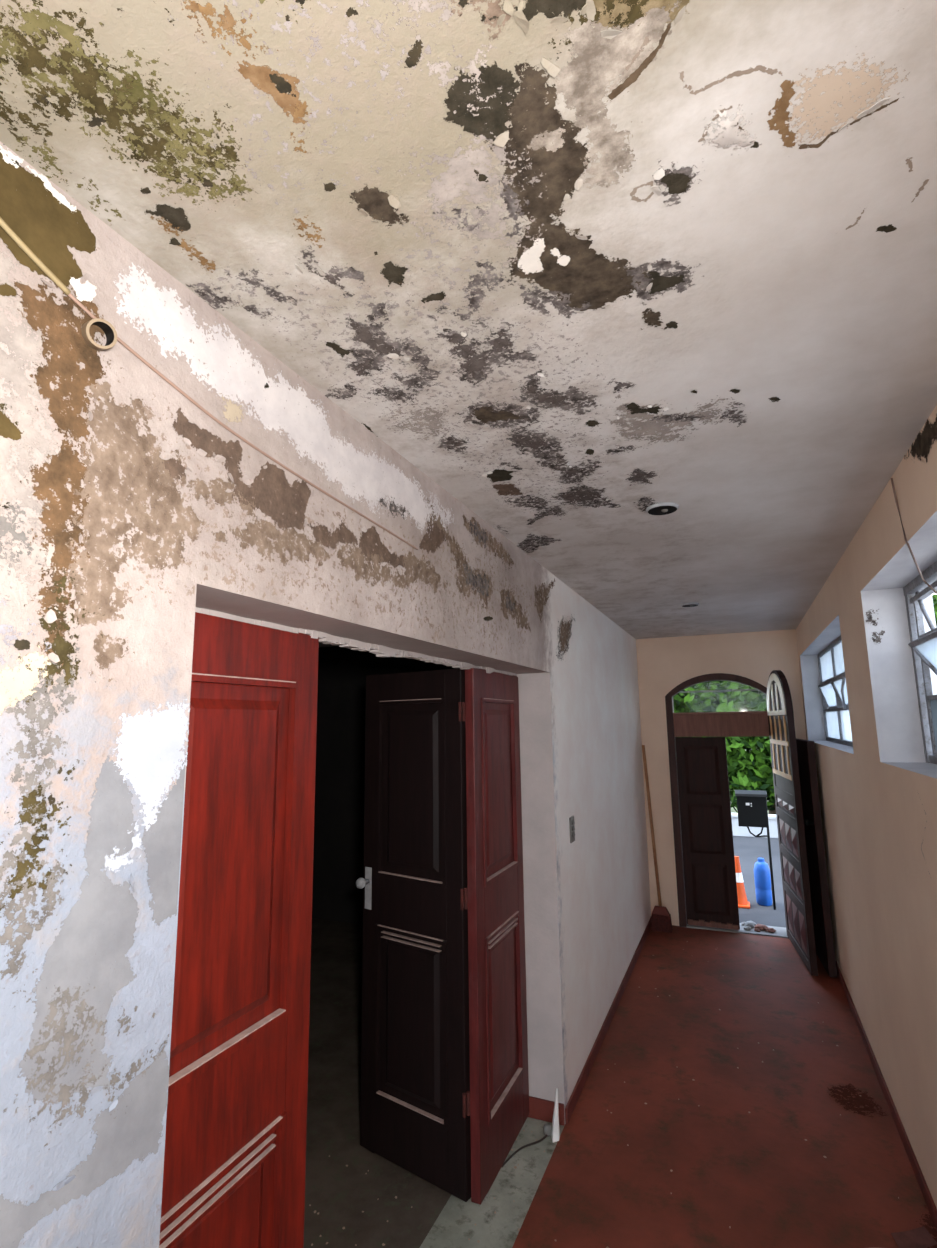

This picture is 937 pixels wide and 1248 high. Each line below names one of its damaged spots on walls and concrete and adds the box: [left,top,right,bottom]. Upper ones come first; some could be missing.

leakage [0,275,153,974]
leakage [0,0,615,520]
flaking render [96,0,748,676]
peeling [679,53,910,149]
flaking render [904,413,937,462]
peeling [0,698,190,1248]